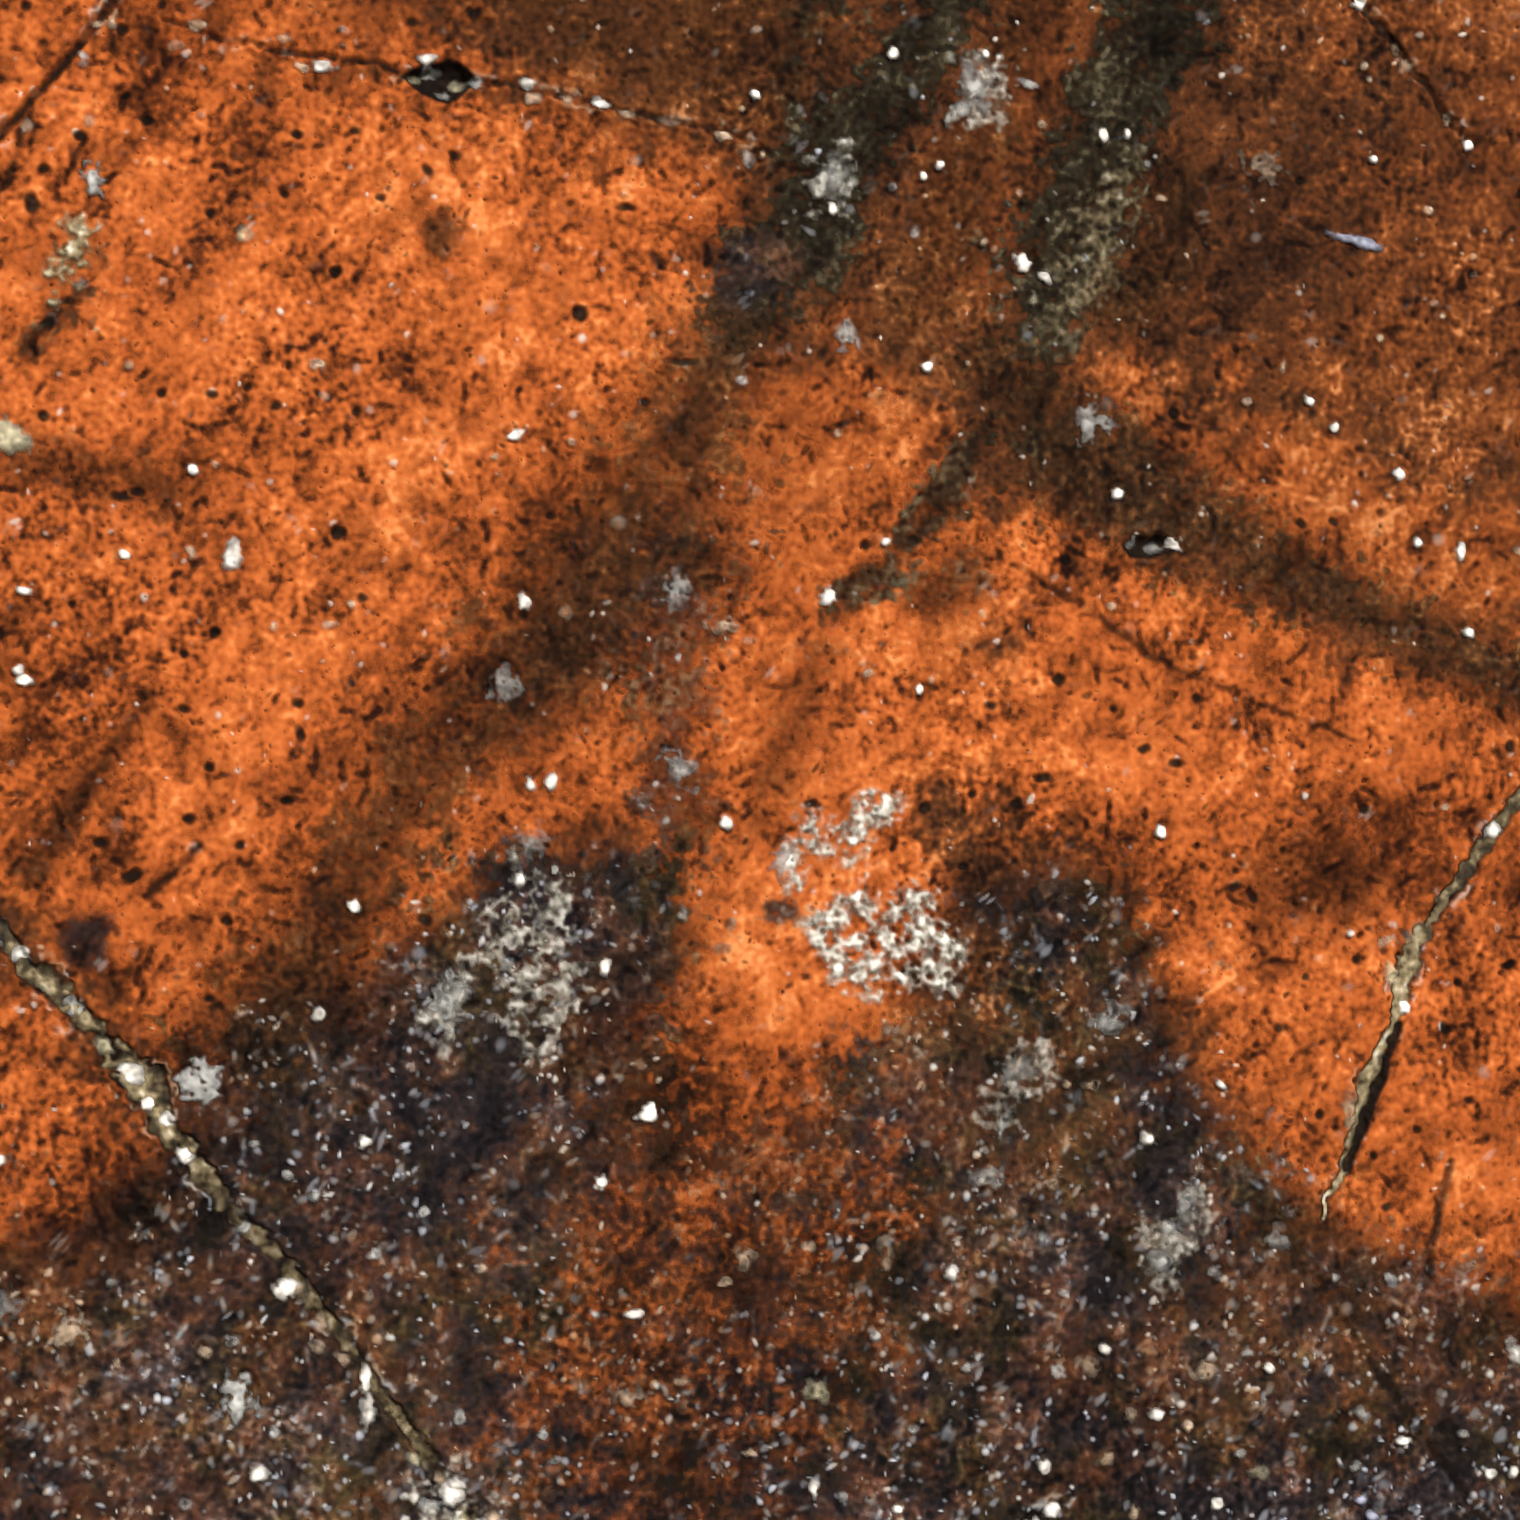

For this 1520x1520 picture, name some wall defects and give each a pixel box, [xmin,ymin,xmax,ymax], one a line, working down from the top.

crack [0,0,116,192]
crack [169,21,223,42]
crack [269,49,438,73]
crack [476,77,741,138]
crack [145,844,202,898]
crack [1321,787,1520,1220]
crack [0,917,499,1520]
crack [1426,1159,1453,1277]